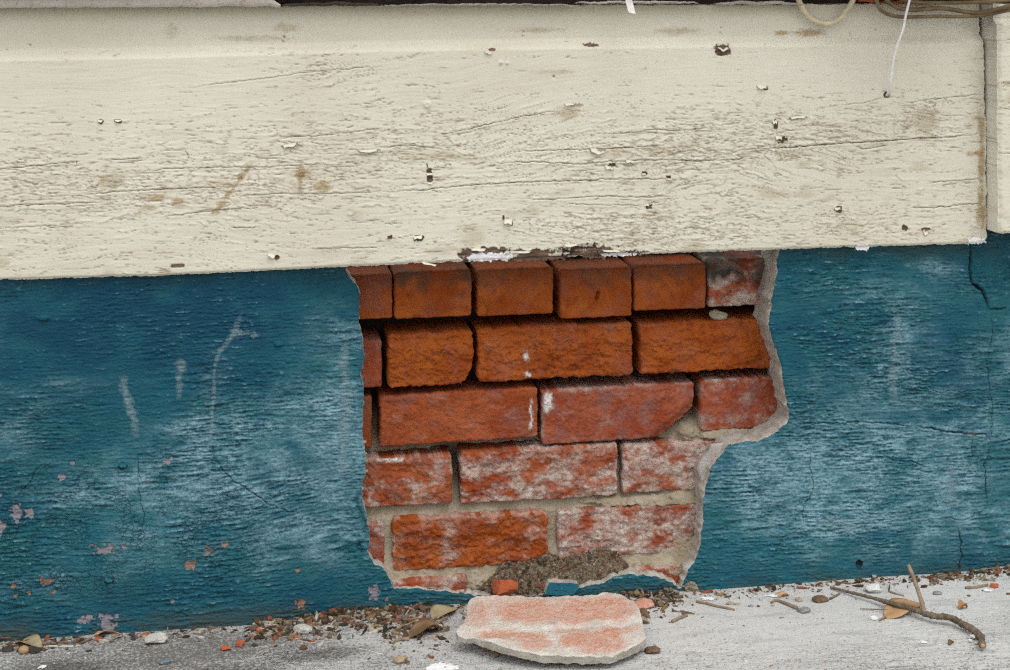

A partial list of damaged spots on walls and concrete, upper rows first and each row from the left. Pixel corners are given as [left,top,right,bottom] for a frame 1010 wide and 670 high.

peeling [457,243,647,264]
spalling [578,249,789,589]
crack [799,245,1010,570]
peeling [0,500,34,536]
spalling [362,485,491,601]